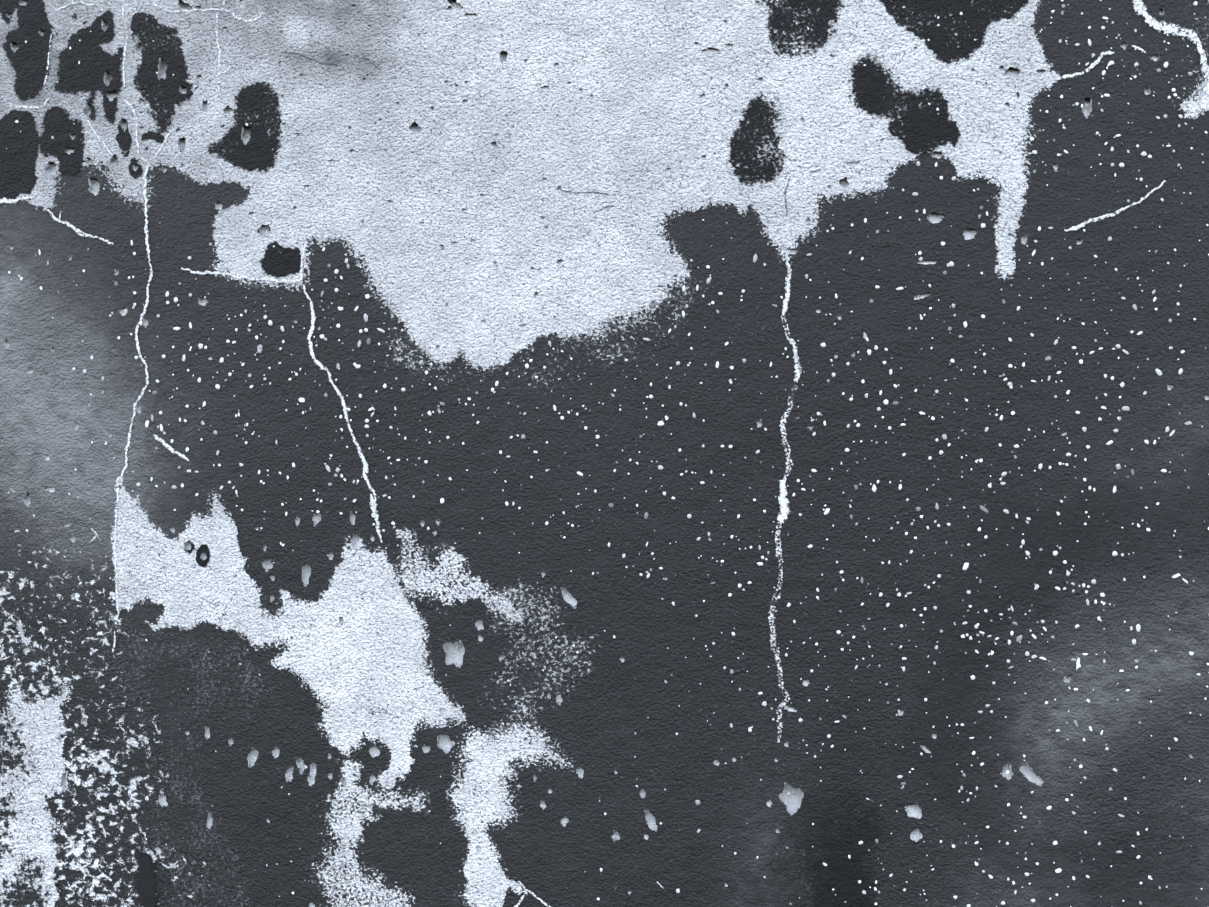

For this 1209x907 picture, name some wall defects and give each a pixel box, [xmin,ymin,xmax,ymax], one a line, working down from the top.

leakage [0,0,194,200]
leakage [208,81,283,172]
leakage [728,91,789,188]
leakage [755,0,849,62]
leakage [848,54,962,154]
leakage [880,0,1029,64]
crack [1057,0,1209,113]
crack [0,0,382,652]
crack [768,257,802,742]
crack [515,881,551,907]